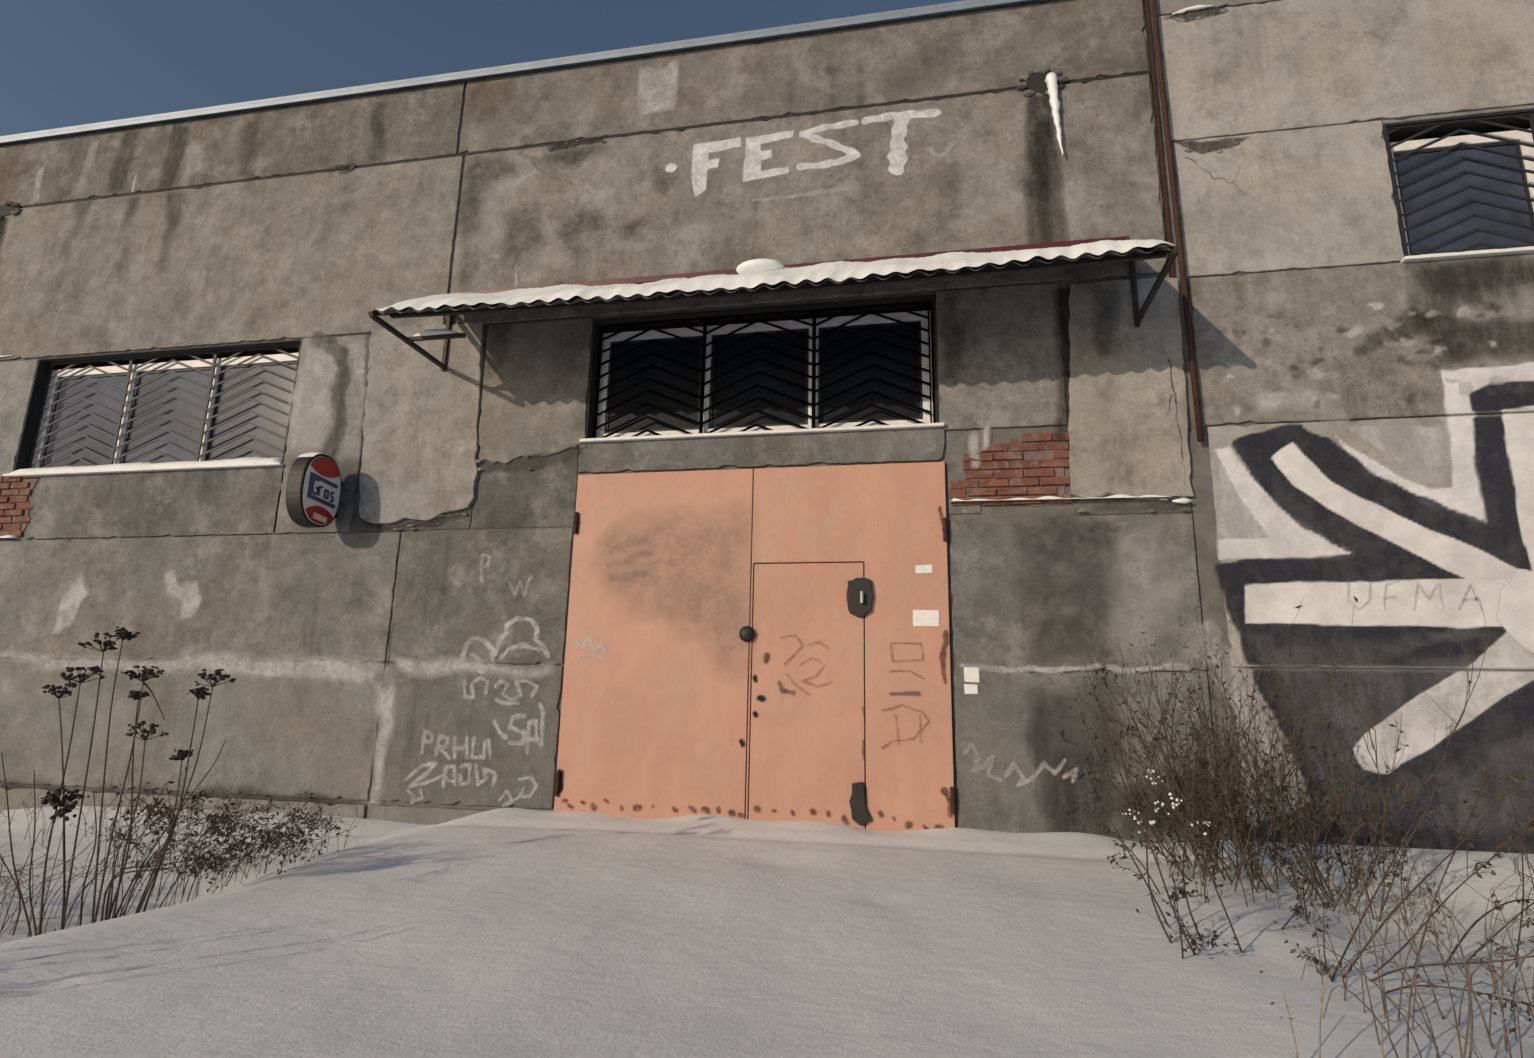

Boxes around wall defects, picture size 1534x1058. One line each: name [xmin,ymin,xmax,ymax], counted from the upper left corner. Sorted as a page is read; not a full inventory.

leakage [1028,95,1055,216]
flaking render [949,432,1193,513]
flaking render [0,476,40,539]
corrosion [557,769,654,810]
corrosion [672,806,847,823]
corrosion [879,788,951,829]